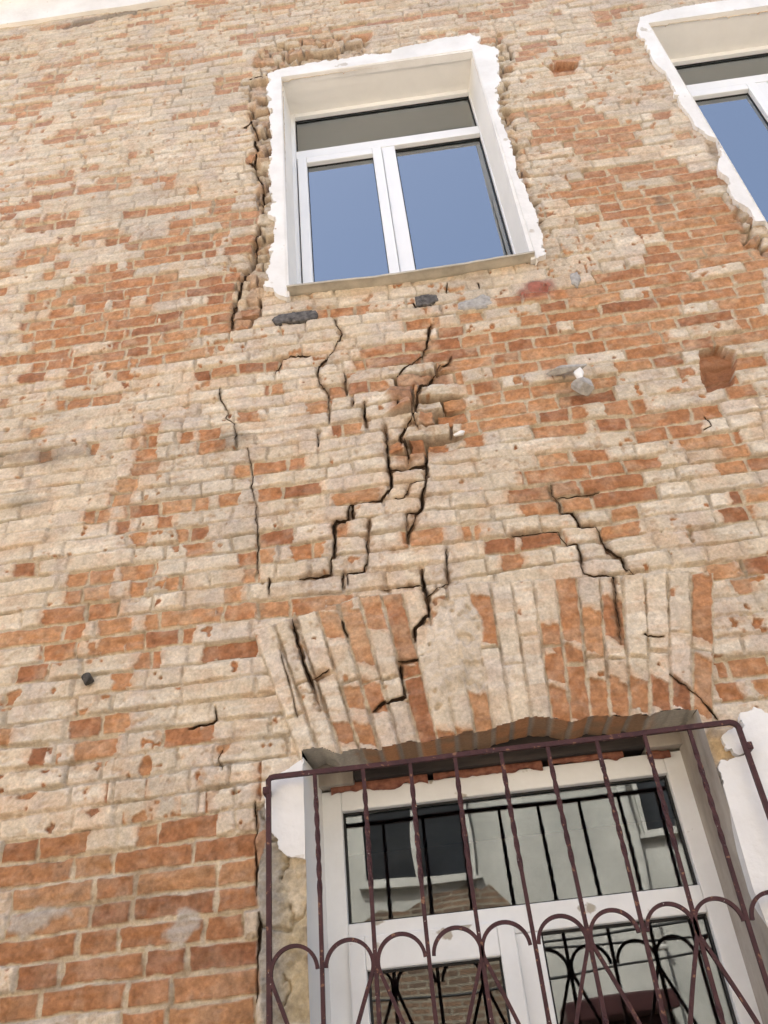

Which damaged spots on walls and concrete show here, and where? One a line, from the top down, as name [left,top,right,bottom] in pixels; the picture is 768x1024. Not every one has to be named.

crack [243,118,265,208]
crack [231,235,261,330]
spalling [305,91,758,414]
crack [275,303,451,583]
spalling [419,367,768,476]
spalling [259,483,380,505]
spalling [507,449,662,541]
spalling [718,491,749,523]
crack [512,483,664,639]
crack [280,619,329,717]
crack [373,550,449,712]
peeling [331,751,624,795]